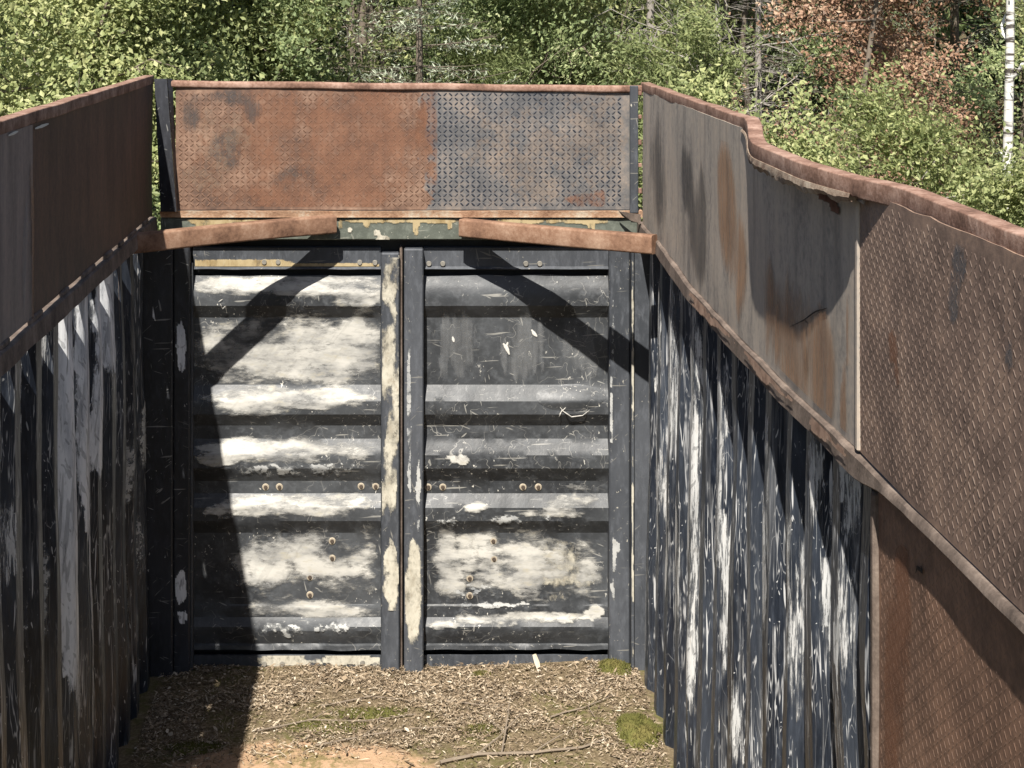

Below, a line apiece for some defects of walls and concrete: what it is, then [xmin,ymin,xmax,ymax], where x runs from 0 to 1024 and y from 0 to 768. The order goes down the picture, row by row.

corrosion [498,219,606,229]
corrosion [718,146,745,309]
corrosion [817,193,839,215]
peeling [175,258,421,517]
corrosion [689,292,793,402]
peeling [231,483,646,642]